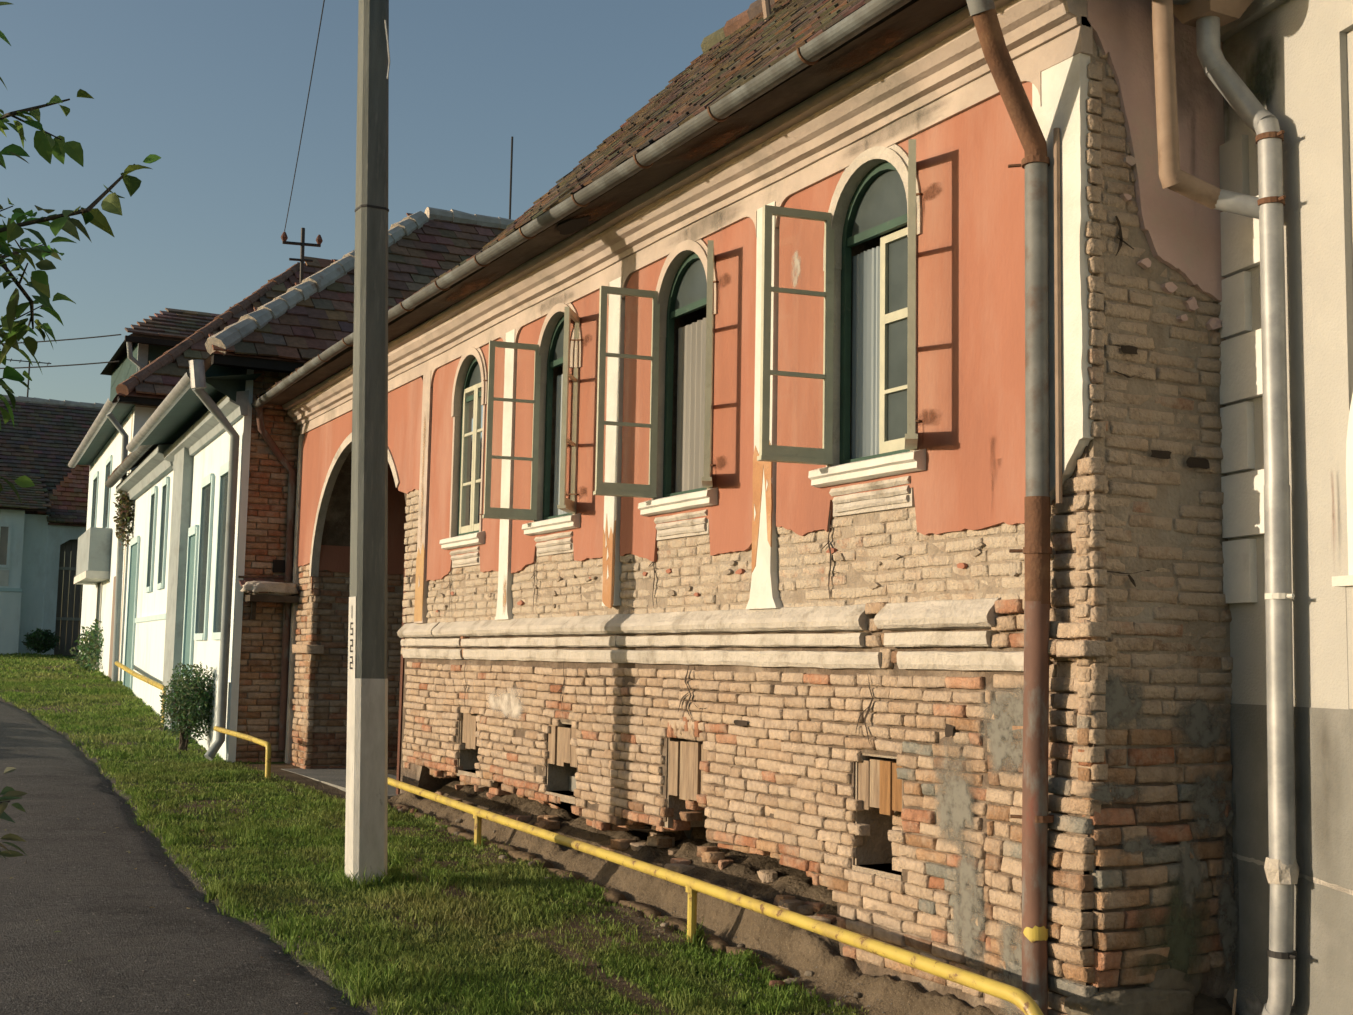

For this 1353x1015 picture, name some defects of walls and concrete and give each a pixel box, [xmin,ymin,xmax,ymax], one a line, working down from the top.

flaking render [1049,46,1233,731]
flaking render [290,560,350,769]
flaking render [387,440,1025,767]
crack [856,674,873,744]